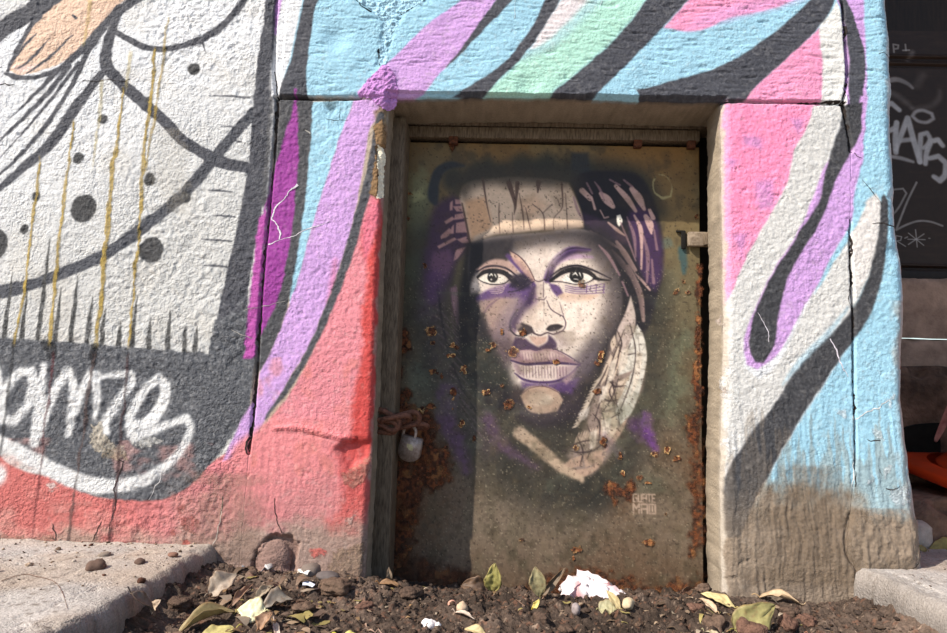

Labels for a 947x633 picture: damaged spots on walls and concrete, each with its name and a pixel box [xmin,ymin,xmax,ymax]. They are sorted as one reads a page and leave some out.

crack [797,74,861,158]
crack [839,1,847,48]
crack [245,72,280,455]
rust [394,326,474,586]
rust [551,545,698,593]
rust [673,263,705,558]
crack [848,218,880,445]